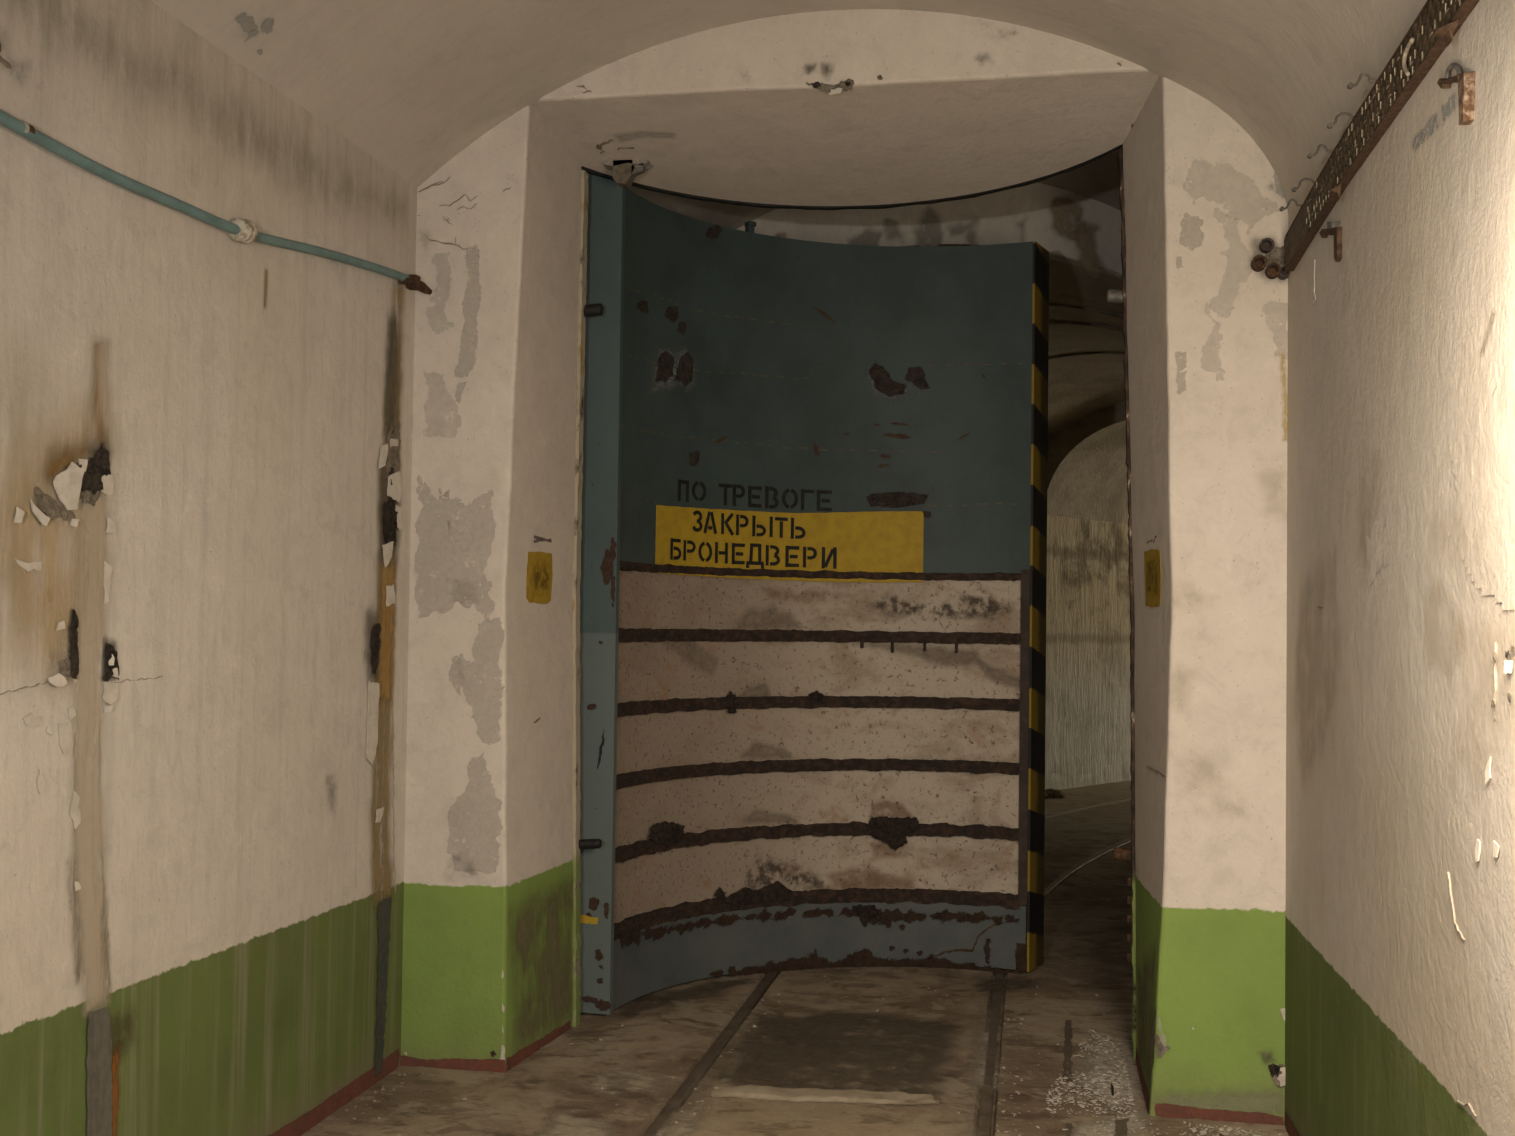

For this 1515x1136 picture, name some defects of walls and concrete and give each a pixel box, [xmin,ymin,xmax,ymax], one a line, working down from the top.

peeling [1175,352,1186,394]
spalling [13,431,116,687]
crack [0,680,73,695]
spalling [102,640,120,713]
crack [115,675,164,683]
rust [586,897,609,924]
rust [618,907,1027,978]
rust [582,949,611,1011]